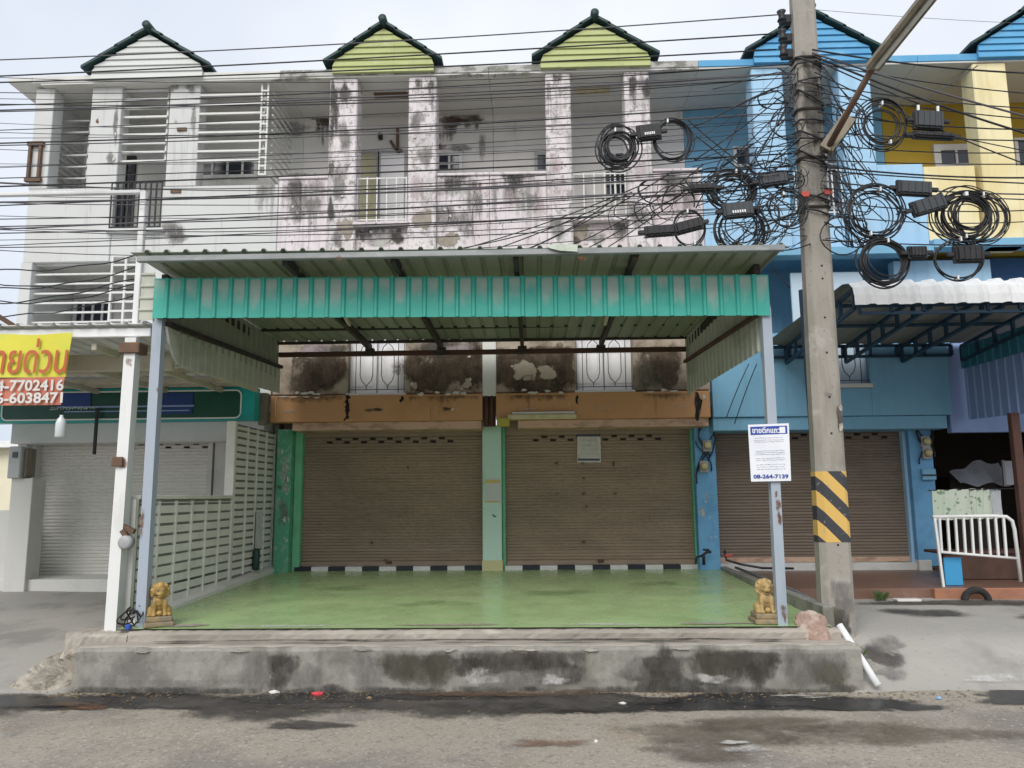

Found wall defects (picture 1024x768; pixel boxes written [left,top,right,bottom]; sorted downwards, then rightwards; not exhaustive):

water stain [446,176,481,209]
water stain [492,174,538,202]
water stain [291,345,346,400]
water stain [393,342,483,398]
water stain [496,343,576,399]
spalling [511,360,563,394]
water stain [640,346,681,397]
water stain [353,641,584,693]
water stain [590,640,855,693]